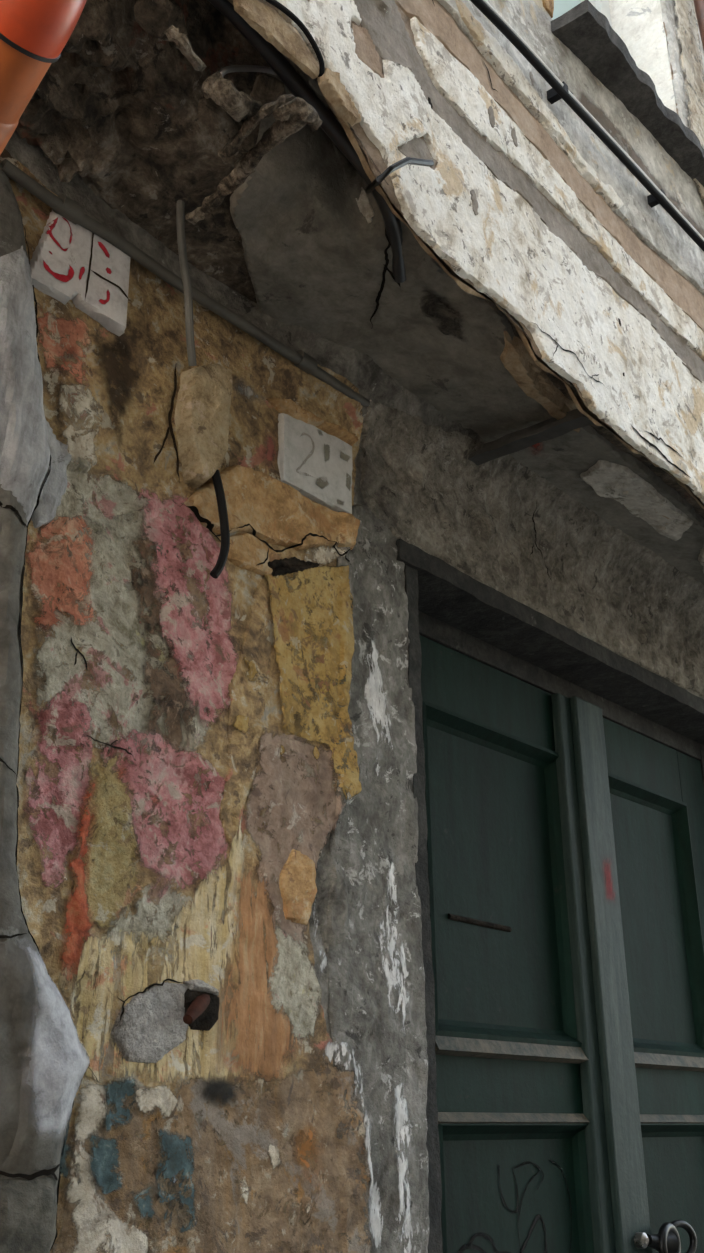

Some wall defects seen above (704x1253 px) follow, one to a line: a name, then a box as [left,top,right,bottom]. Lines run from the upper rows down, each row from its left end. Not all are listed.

crack [22,222,40,362]
crack [370,227,401,329]
crack [154,363,352,566]
crack [0,454,98,1081]
peeling [23,303,371,1253]
damp [378,862,410,1031]
damp [325,1041,383,1247]
damp [394,1083,413,1253]